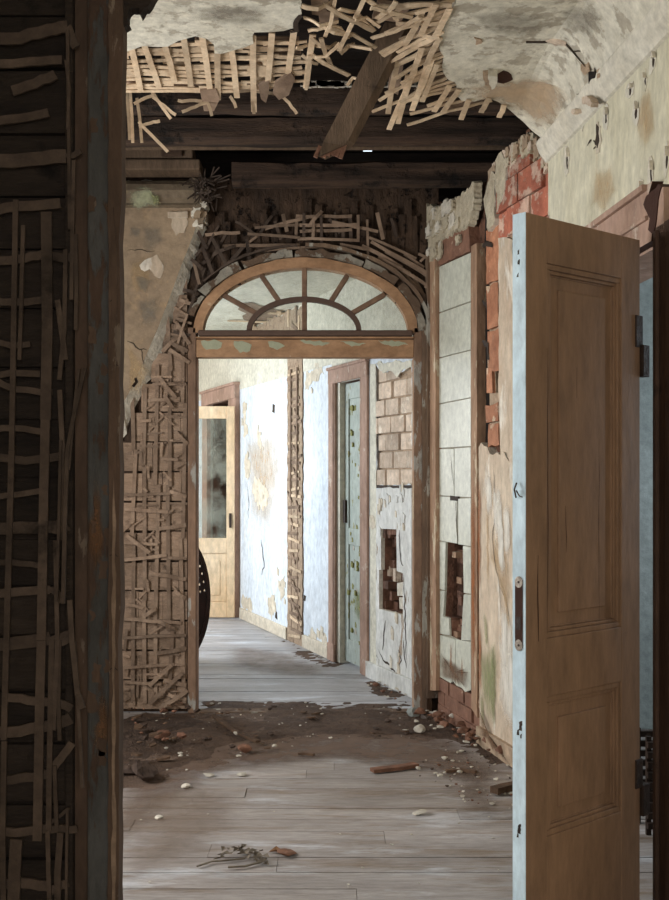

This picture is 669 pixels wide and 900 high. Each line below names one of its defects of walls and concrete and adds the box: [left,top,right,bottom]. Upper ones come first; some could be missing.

peeling [483,69,497,89]
leakage [482,81,557,119]
spalling [625,51,656,126]
spalling [571,96,609,154]
spalling [139,255,164,278]
flaking render [425,132,549,447]
peeling [201,339,222,350]
peeling [234,341,252,353]
peeling [369,360,412,679]